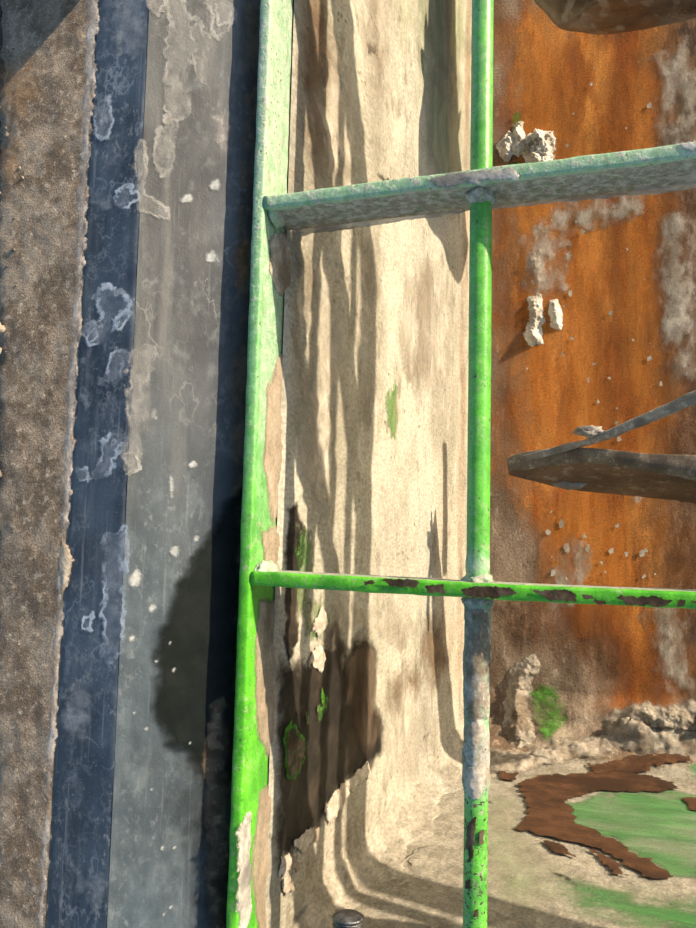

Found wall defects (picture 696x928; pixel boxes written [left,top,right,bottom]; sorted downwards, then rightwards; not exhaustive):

rust [501,2,664,160]
leakage [115,183,140,208]
leakage [96,283,133,330]
rust [494,194,669,454]
peeling [285,504,306,571]
rust [524,480,657,588]
rust [564,603,671,711]
peeling [277,587,384,895]
rust [201,698,229,928]